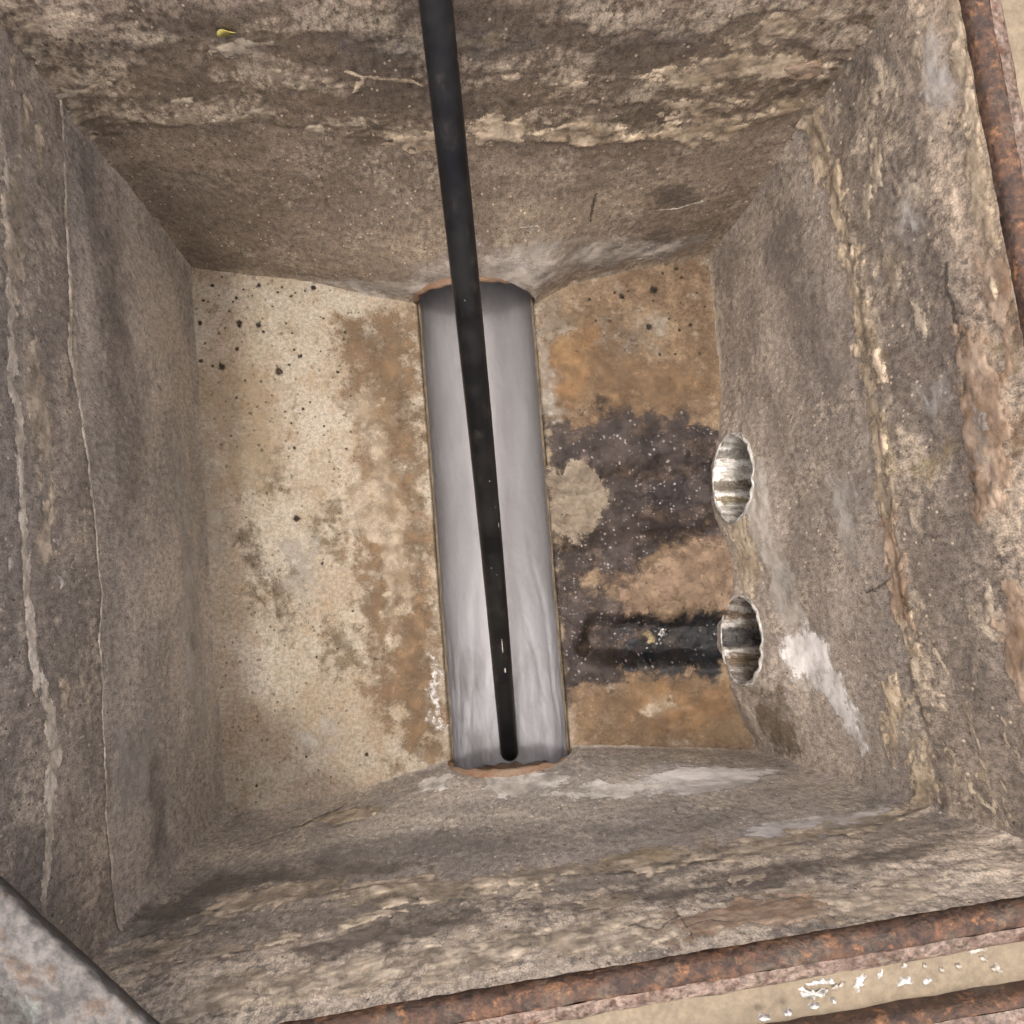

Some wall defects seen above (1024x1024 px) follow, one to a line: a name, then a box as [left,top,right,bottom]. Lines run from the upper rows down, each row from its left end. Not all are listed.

crack [59,99,123,932]
damp [728,472,794,602]
damp [834,484,852,537]
damp [756,704,800,752]
damp [776,602,869,756]